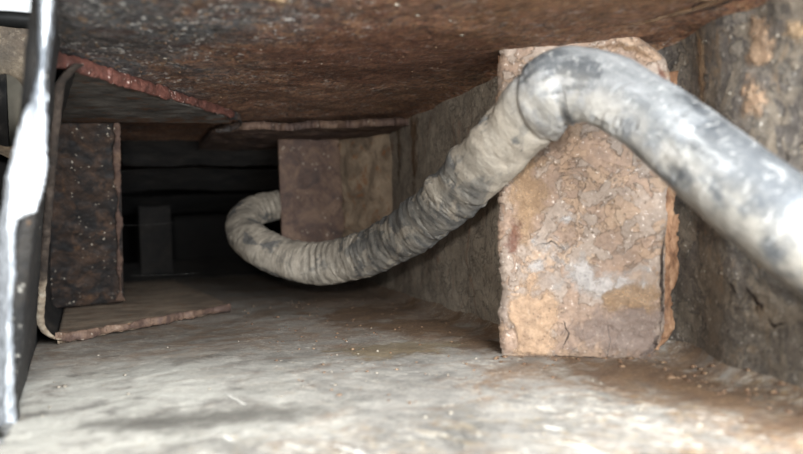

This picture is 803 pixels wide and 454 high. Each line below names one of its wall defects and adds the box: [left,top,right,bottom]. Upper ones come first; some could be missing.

rust [591,44,648,57]
rust [659,71,678,85]